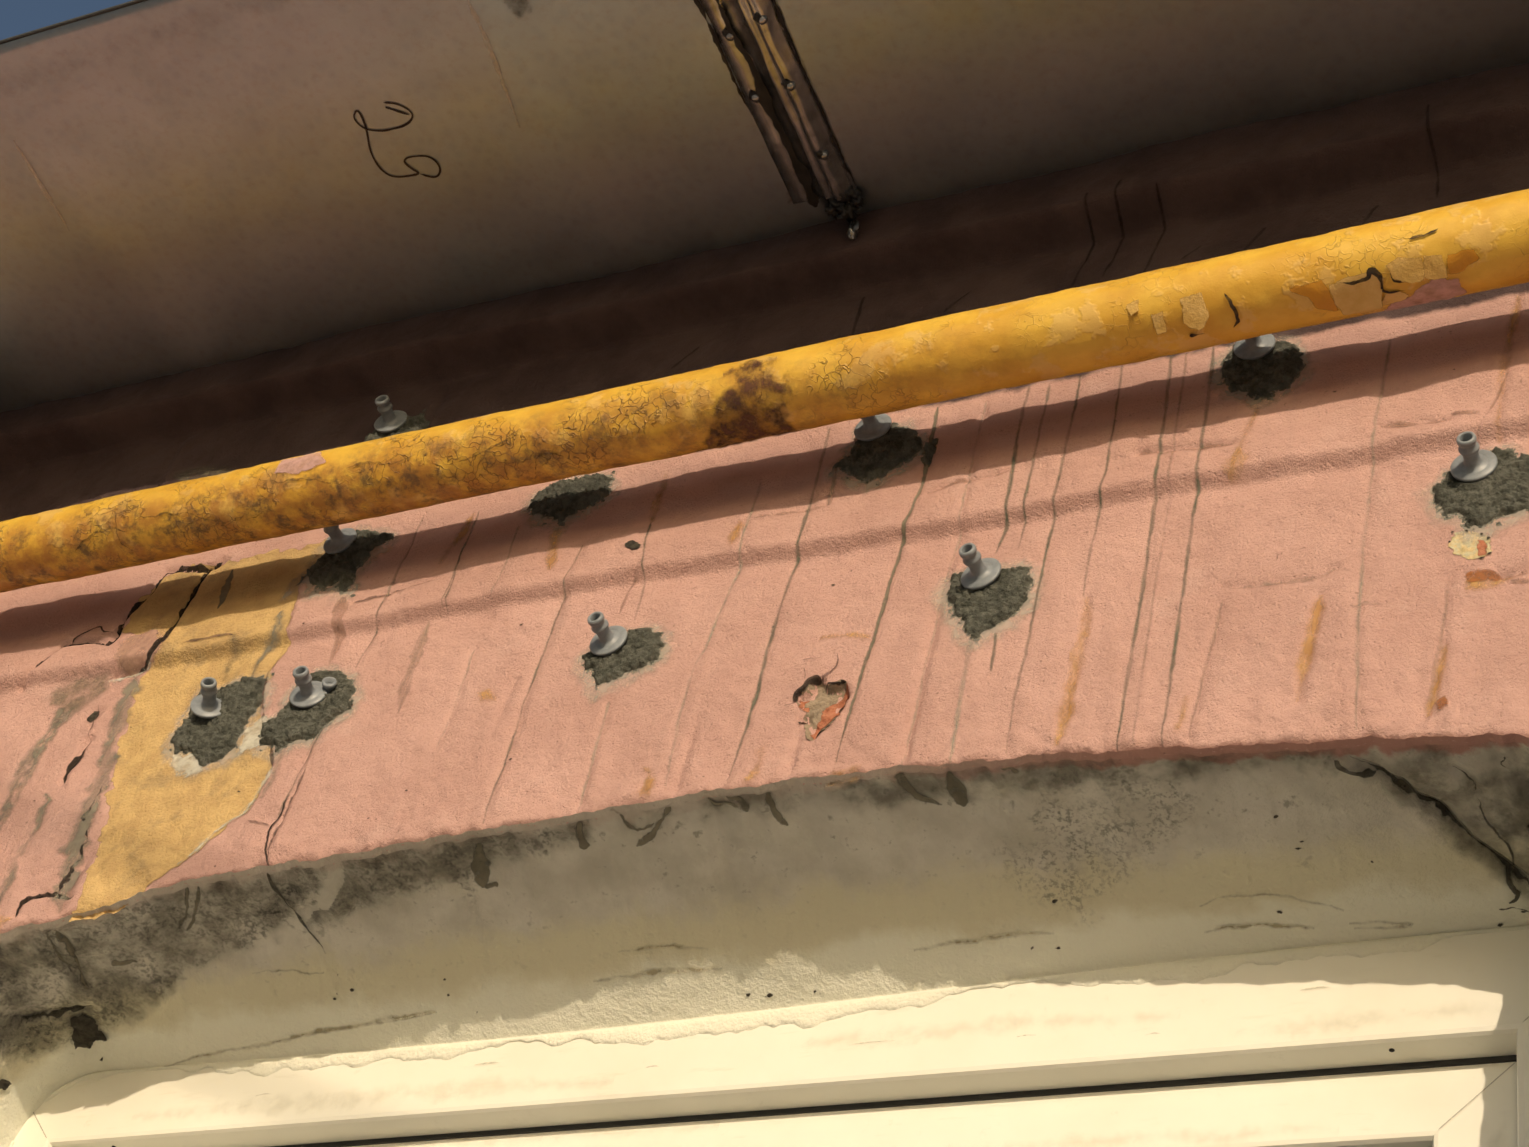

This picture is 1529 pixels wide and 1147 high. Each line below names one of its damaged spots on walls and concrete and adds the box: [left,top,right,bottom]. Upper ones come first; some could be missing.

crack [77,512,207,549]
peeling [1448,530,1492,559]
leakage [0,679,105,821]
leakage [52,678,140,902]
crack [15,562,233,1061]
peeling [69,539,327,922]
leakage [431,837,499,889]
leakage [620,807,671,847]
leakage [708,792,788,826]
spalling [792,655,849,741]
leakage [869,771,968,807]
crack [1334,757,1529,912]